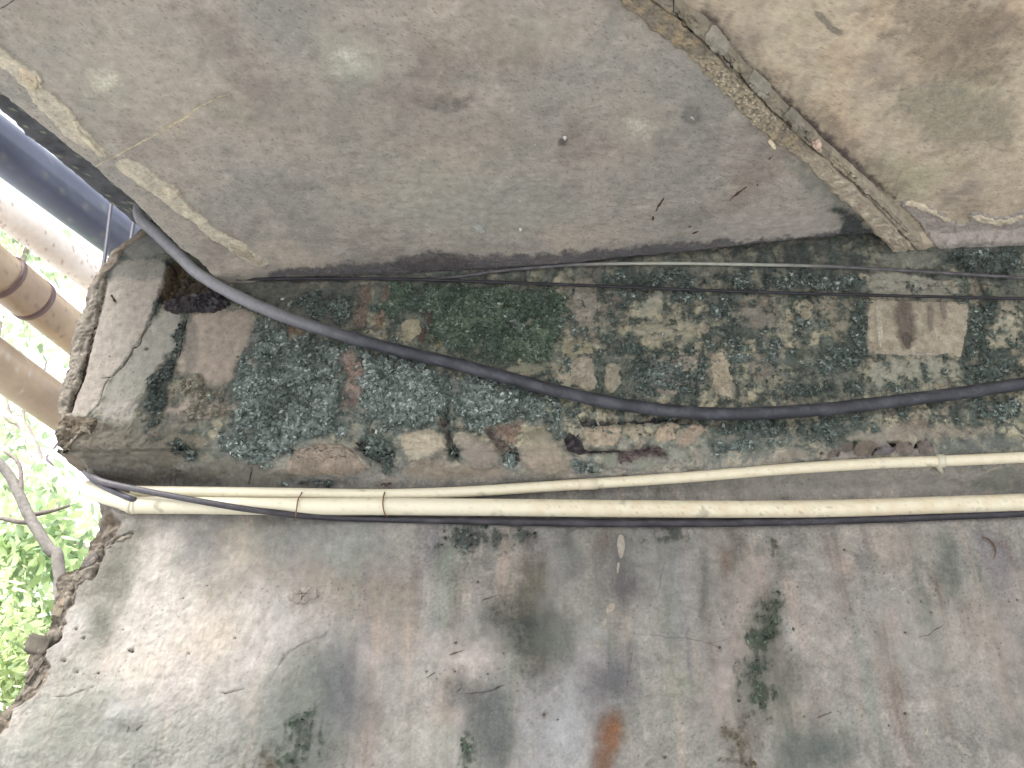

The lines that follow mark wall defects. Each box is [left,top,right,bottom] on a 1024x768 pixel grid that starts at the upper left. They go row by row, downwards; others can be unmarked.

spalling [705,25,772,99]
spalling [784,107,822,152]
crack [71,278,160,414]
water stain [896,301,915,349]
spalling [54,415,98,453]
spalling [2,533,132,720]
rust [599,715,620,768]